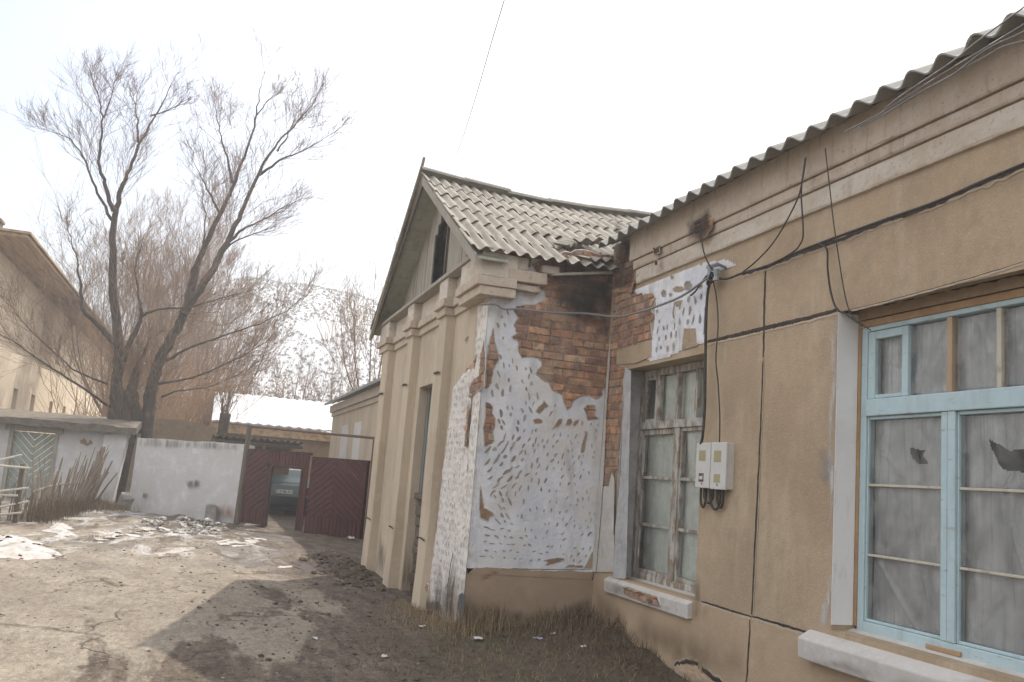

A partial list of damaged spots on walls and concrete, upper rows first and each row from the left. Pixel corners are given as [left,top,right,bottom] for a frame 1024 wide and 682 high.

peeling [464,328,499,447]
peeling [511,245,703,486]
spalling [479,486,495,522]
flaking render [623,587,660,606]